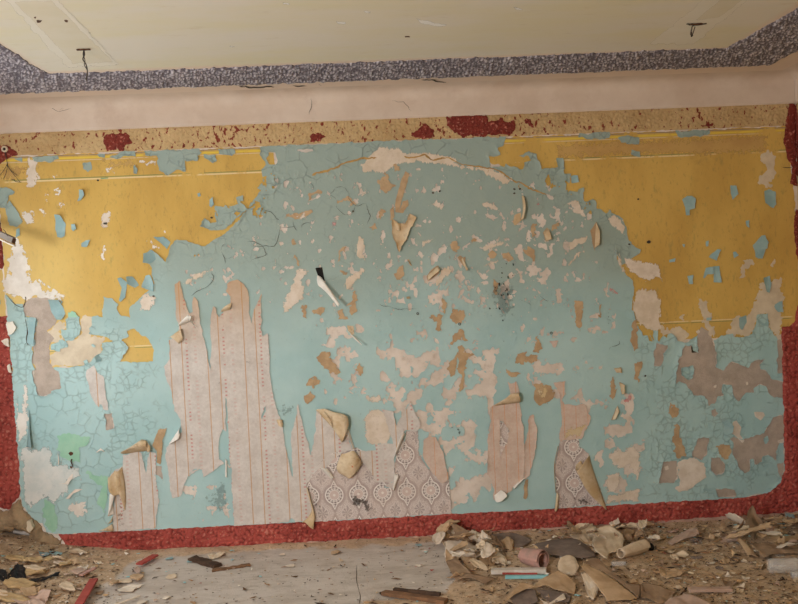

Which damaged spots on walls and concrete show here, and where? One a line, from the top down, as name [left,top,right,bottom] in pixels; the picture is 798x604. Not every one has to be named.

crack [312,157,376,224]
crack [404,154,546,195]
peeling [0,115,798,556]